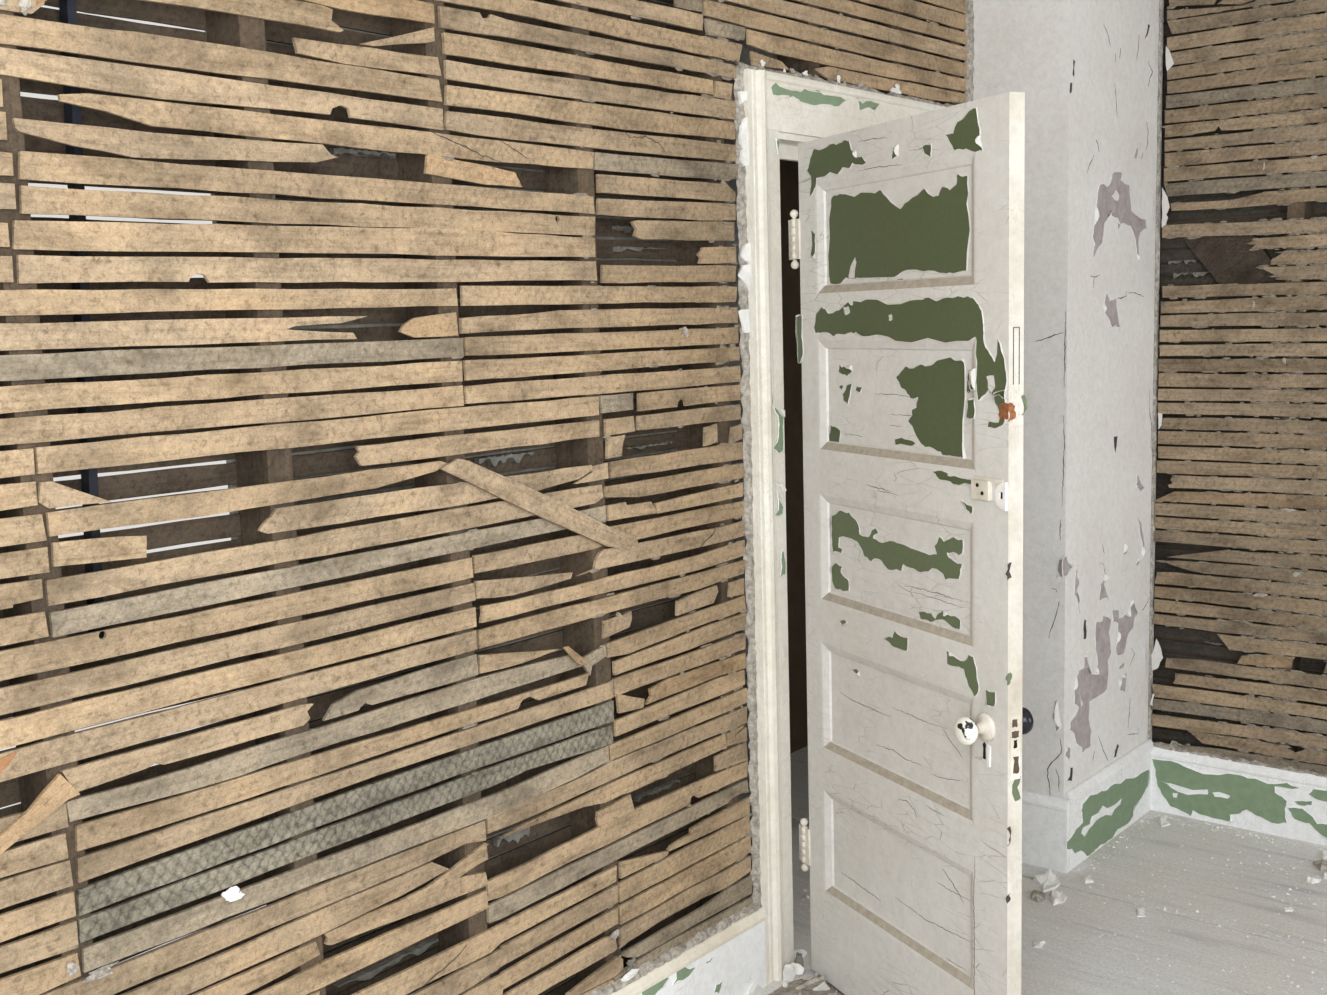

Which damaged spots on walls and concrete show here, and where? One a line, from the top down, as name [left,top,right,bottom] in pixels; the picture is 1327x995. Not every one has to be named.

peeling [770,82,880,113]
peeling [806,139,866,197]
peeling [945,107,983,153]
peeling [810,172,971,284]
peeling [1092,171,1170,260]
peeling [795,295,1027,515]
peeling [830,510,964,592]
peeling [946,650,1012,708]
peeling [1052,555,1137,781]
peeling [1151,639,1163,671]
peeling [1066,759,1327,859]
peeling [641,956,714,995]